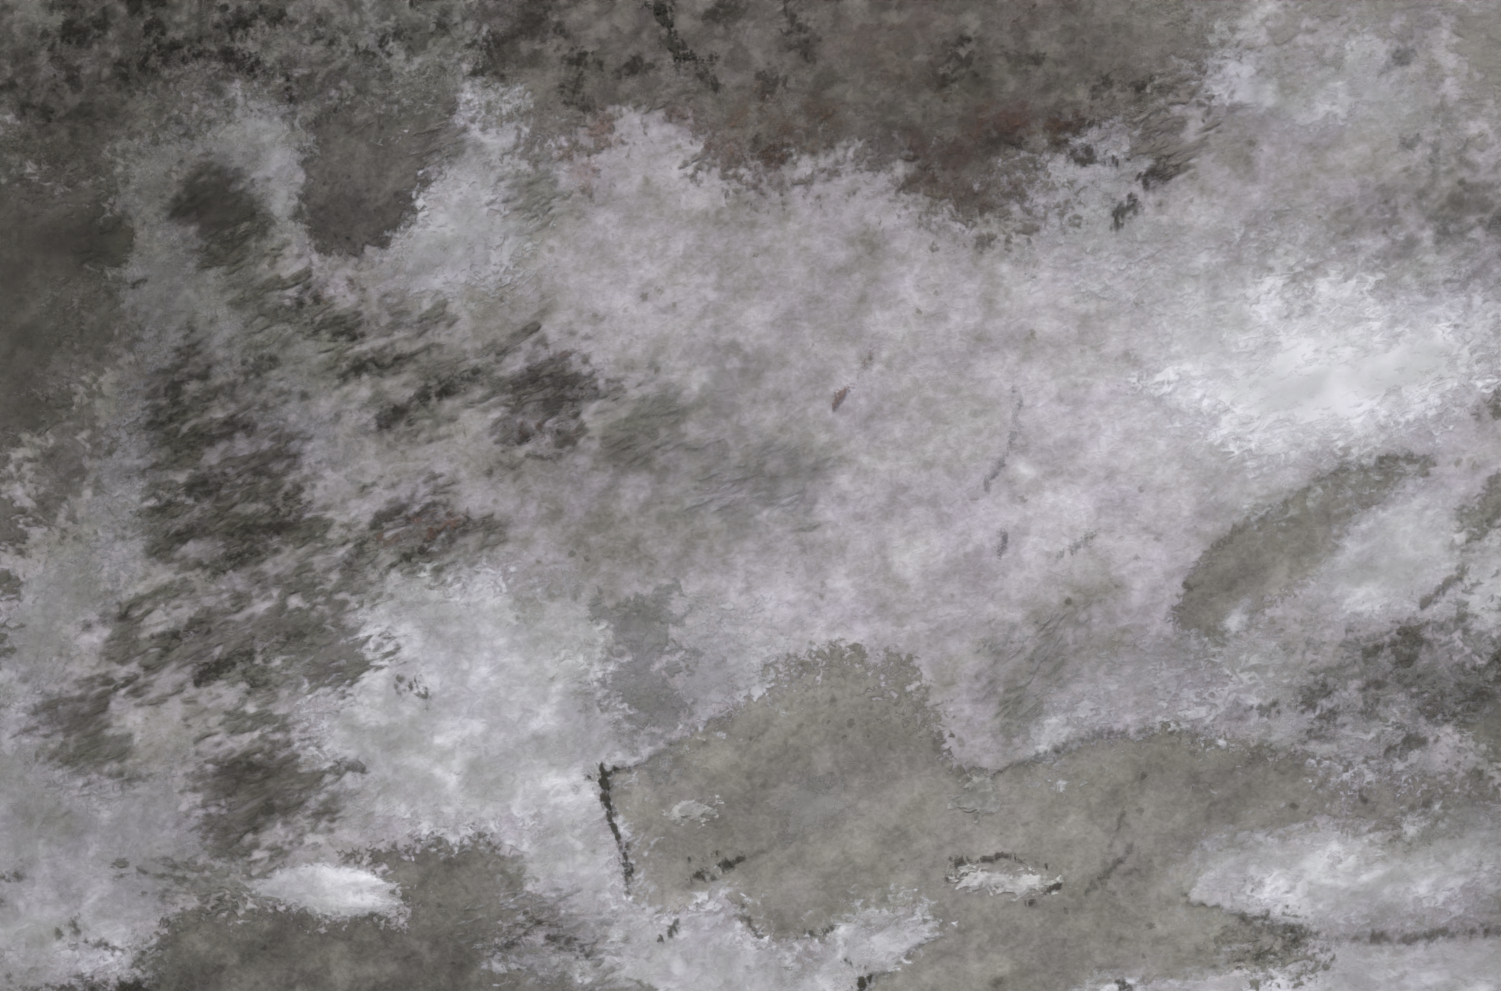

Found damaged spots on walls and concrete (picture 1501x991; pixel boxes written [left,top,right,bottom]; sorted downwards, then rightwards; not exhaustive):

water stain [1259,0,1501,164]
water stain [1127,184,1501,482]
peeling [4,823,594,991]
spalling [330,759,368,778]
spalling [394,673,431,710]
crack [585,762,634,896]
water stain [602,815,641,844]
peeling [607,607,1501,991]
water stain [976,468,1501,991]